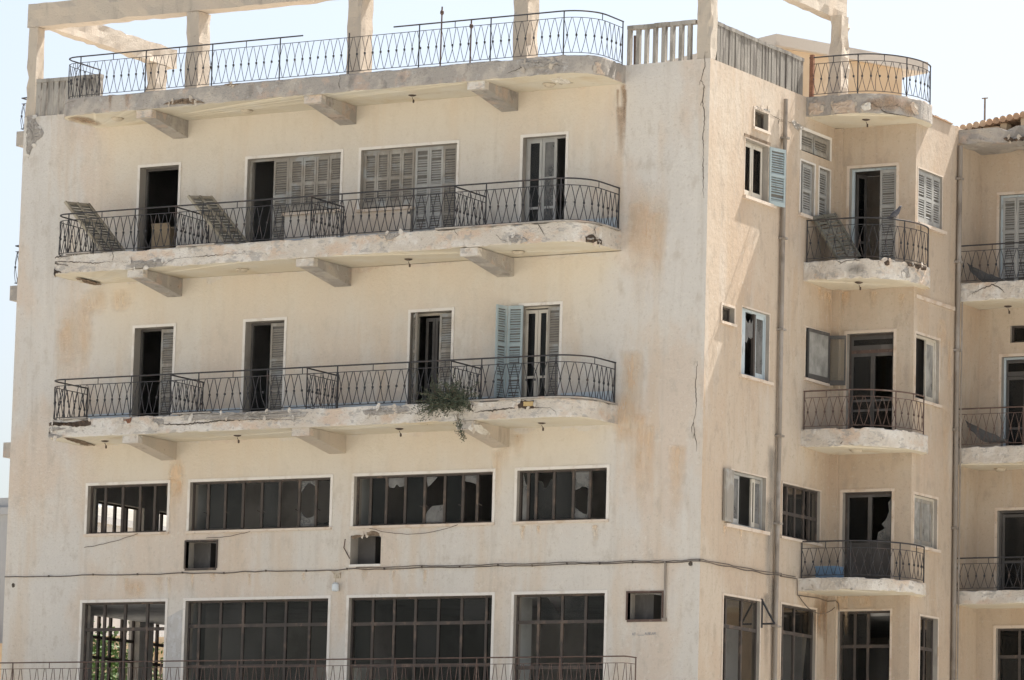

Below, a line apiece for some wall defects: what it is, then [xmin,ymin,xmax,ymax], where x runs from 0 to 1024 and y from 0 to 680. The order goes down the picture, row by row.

spalling [24,115,44,158]
crack [698,55,706,195]
peeling [791,100,871,130]
spalling [581,233,603,247]
peeling [128,257,165,270]
spalling [901,261,927,278]
peeling [184,407,308,423]
peeling [362,403,410,417]
crack [690,364,698,451]
spalling [48,418,95,446]